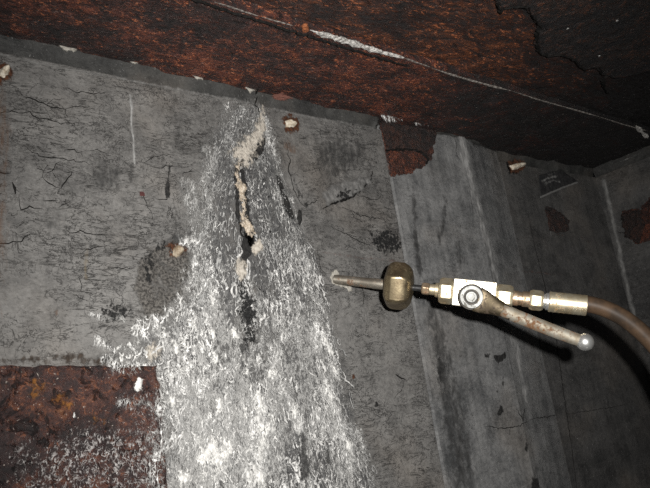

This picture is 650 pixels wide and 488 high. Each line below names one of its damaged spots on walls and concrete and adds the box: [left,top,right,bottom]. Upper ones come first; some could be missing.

crack [1,88,105,124]
rust [282,113,299,134]
spalling [379,115,437,177]
crack [0,148,105,214]
crack [0,230,105,253]
crack [233,89,271,348]
leakage [9,101,379,488]